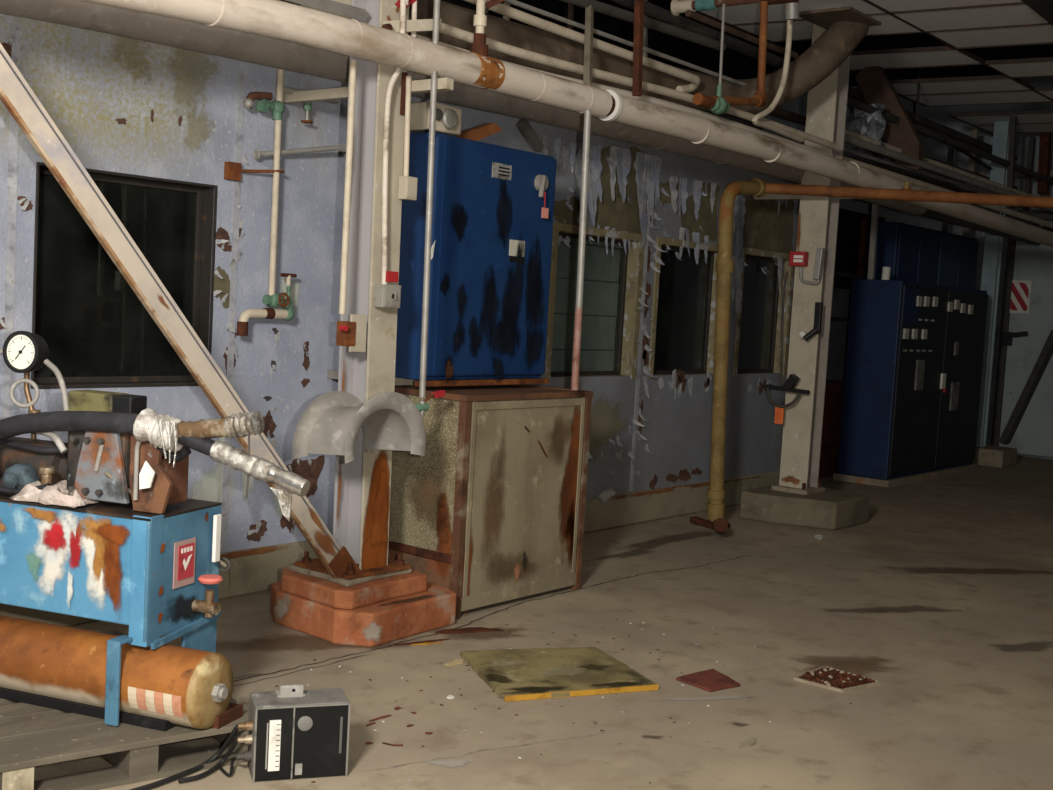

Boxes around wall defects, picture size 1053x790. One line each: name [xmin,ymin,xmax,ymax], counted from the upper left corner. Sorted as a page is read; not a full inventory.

peeling [210,227,245,309]
peeling [552,144,721,434]
peeling [223,323,238,374]
peeling [263,410,277,437]
peeling [286,455,325,498]
peeling [649,468,703,490]
peeling [246,520,267,542]
peeling [280,515,295,533]